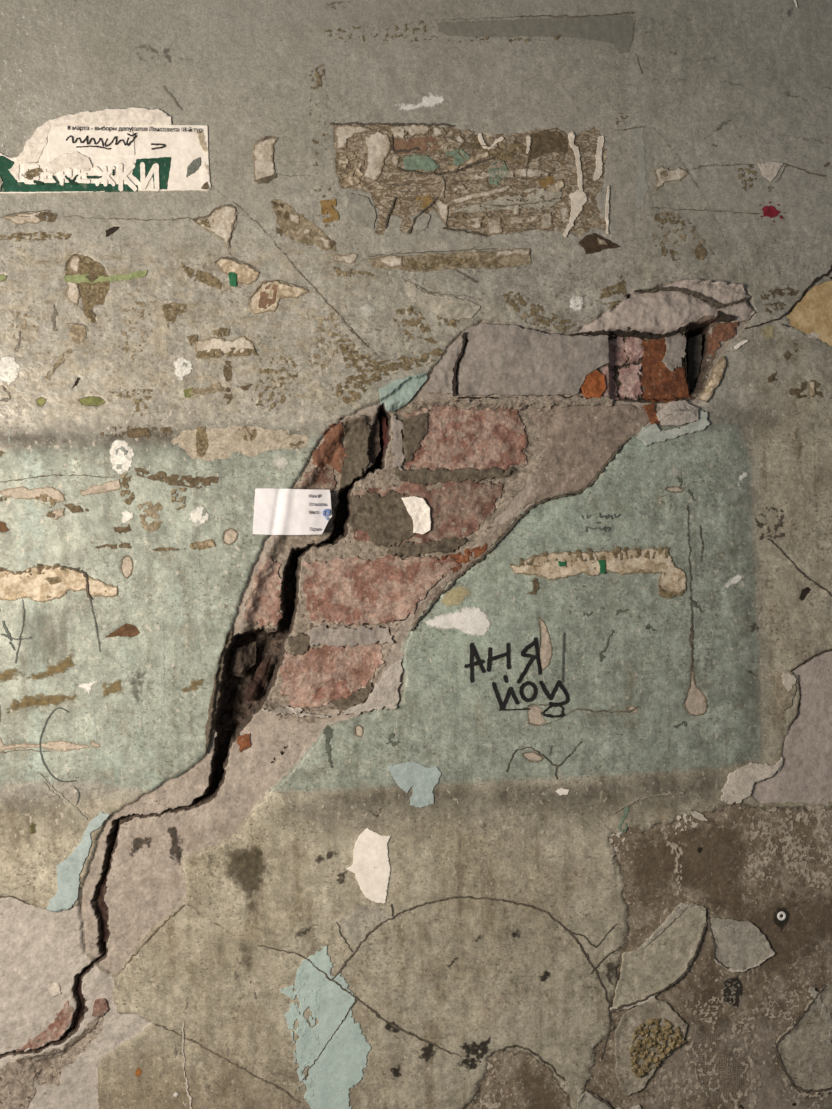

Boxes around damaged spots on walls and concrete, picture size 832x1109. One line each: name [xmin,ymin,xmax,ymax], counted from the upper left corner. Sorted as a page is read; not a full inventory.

crack [452,332,466,397]
crack [744,265,832,329]
crack [0,404,391,1059]
flaking render [0,299,753,1109]
crack [506,741,582,780]
peeling [465,649,832,1109]
crack [154,887,625,1109]